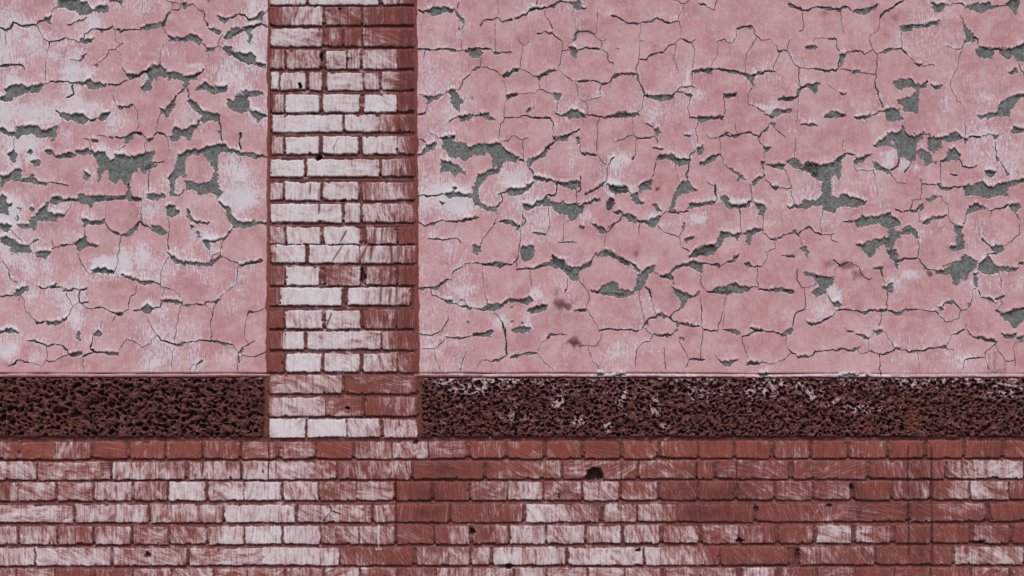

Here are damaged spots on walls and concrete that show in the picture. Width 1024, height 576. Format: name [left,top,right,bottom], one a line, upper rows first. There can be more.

peeling [51,0,123,19]
crack [0,0,224,98]
peeling [0,8,270,297]
crack [113,96,169,152]
peeling [418,2,465,24]
crack [418,0,965,182]
peeling [899,0,1024,76]
peeling [0,283,29,301]
crack [2,204,267,371]
crack [417,213,547,291]
peeling [417,65,1024,369]
crack [574,222,1021,375]